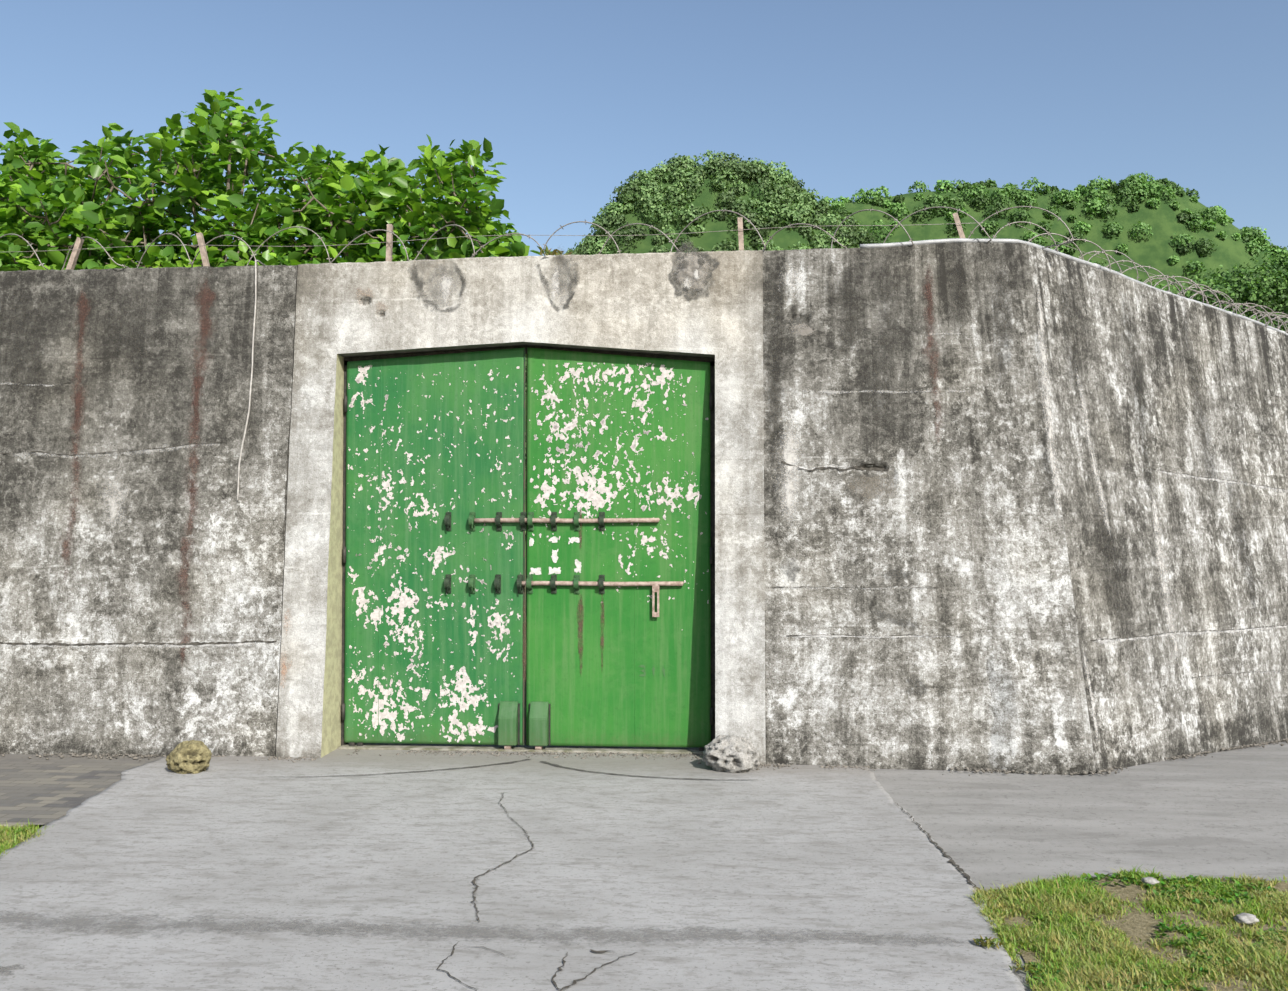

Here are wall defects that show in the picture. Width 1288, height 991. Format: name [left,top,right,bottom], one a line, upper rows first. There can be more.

corrosion [72,296,90,488]
corrosion [179,288,215,658]
peeling [346,363,708,743]
crack [781,460,859,471]
damp [1038,304,1059,493]
damp [1123,320,1177,651]
damp [1205,460,1255,604]
crack [437,793,534,991]
crack [552,949,637,991]